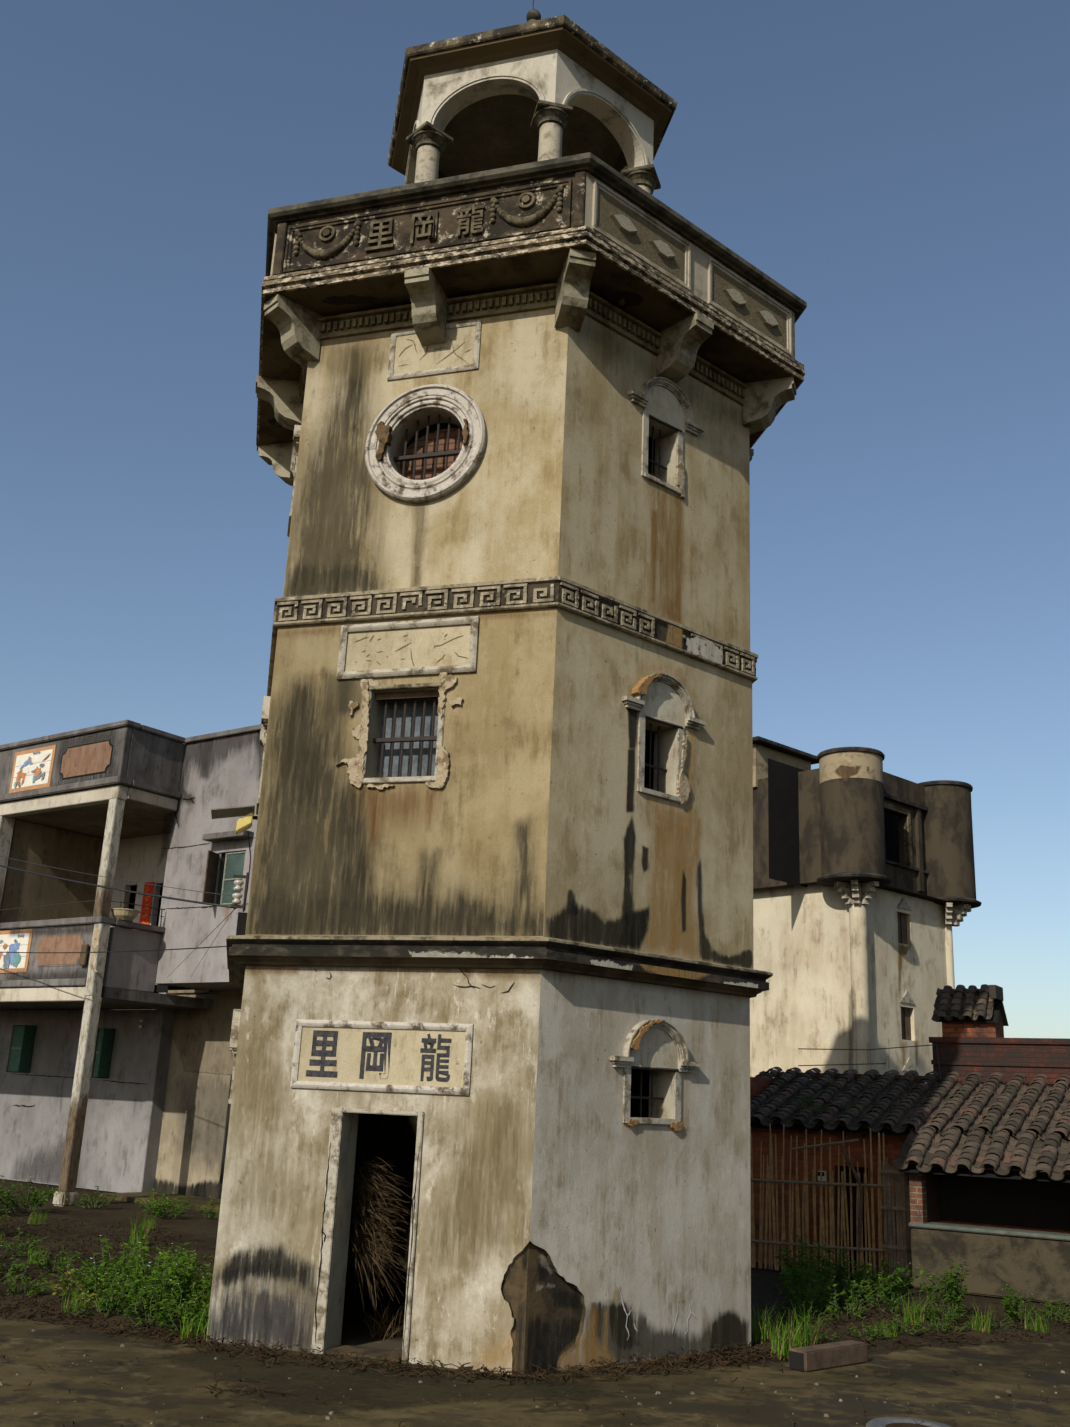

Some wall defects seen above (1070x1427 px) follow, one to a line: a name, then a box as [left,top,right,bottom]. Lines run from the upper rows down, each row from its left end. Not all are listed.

damp [290,353,377,596]
peeling [336,679,395,790]
peeling [425,746,450,789]
peeling [437,672,464,720]
damp [160,685,649,970]
damp [681,863,752,968]
damp [224,1264,305,1284]
damp [163,1292,746,1413]
spalling [501,1241,585,1375]